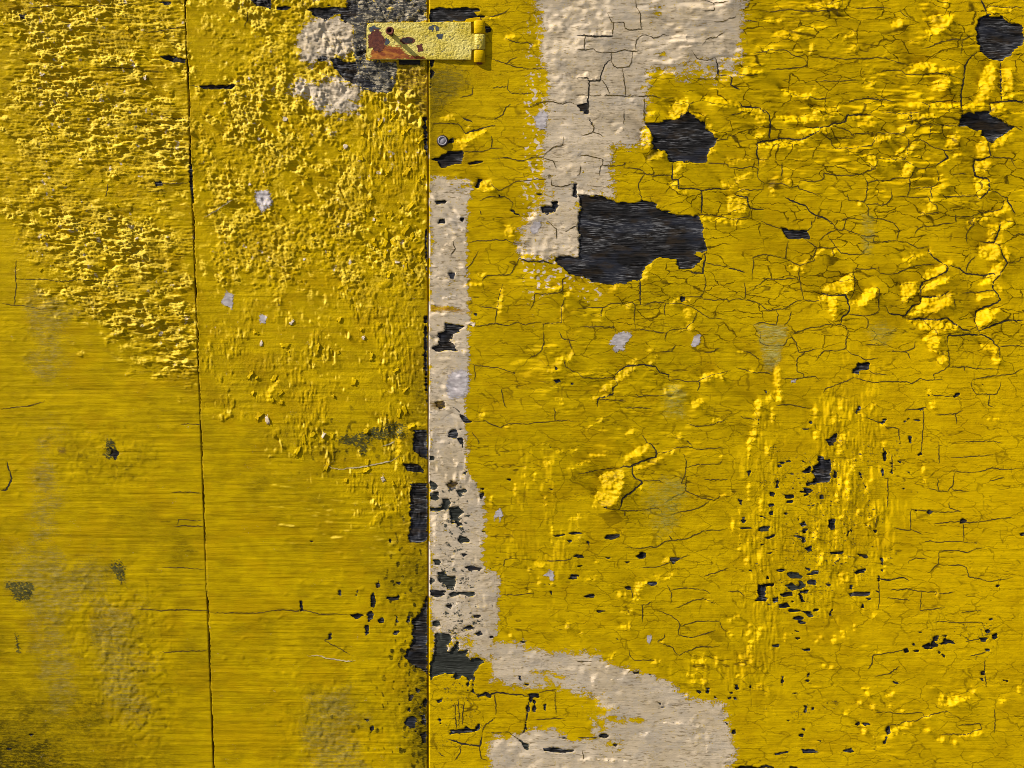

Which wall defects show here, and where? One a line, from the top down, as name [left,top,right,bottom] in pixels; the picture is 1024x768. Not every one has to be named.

peeling [284,0,491,121]
corrosion [367,29,427,111]
peeling [975,14,1024,61]
peeling [511,0,749,285]
peeling [958,112,1015,143]
crack [431,0,1024,685]
peeling [351,117,788,768]
peeling [738,433,837,554]
crack [138,609,350,655]
peeling [755,567,833,651]
crack [440,689,598,760]
crack [877,710,996,735]